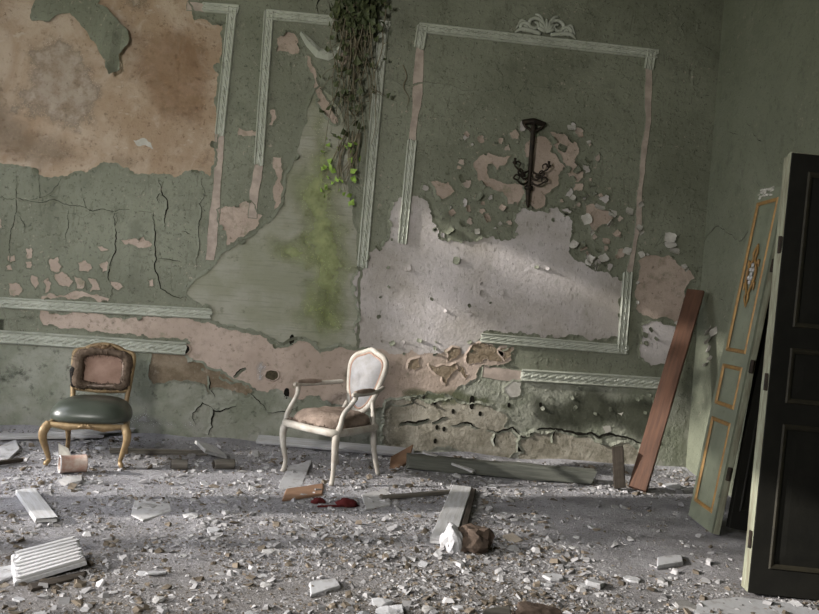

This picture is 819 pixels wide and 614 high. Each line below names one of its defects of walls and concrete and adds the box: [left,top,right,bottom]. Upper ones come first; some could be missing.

spalling [0,0,226,180]
peeling [5,244,125,303]
crack [0,175,205,303]
spalling [37,29,696,464]
crack [190,367,298,435]
crack [399,417,641,452]